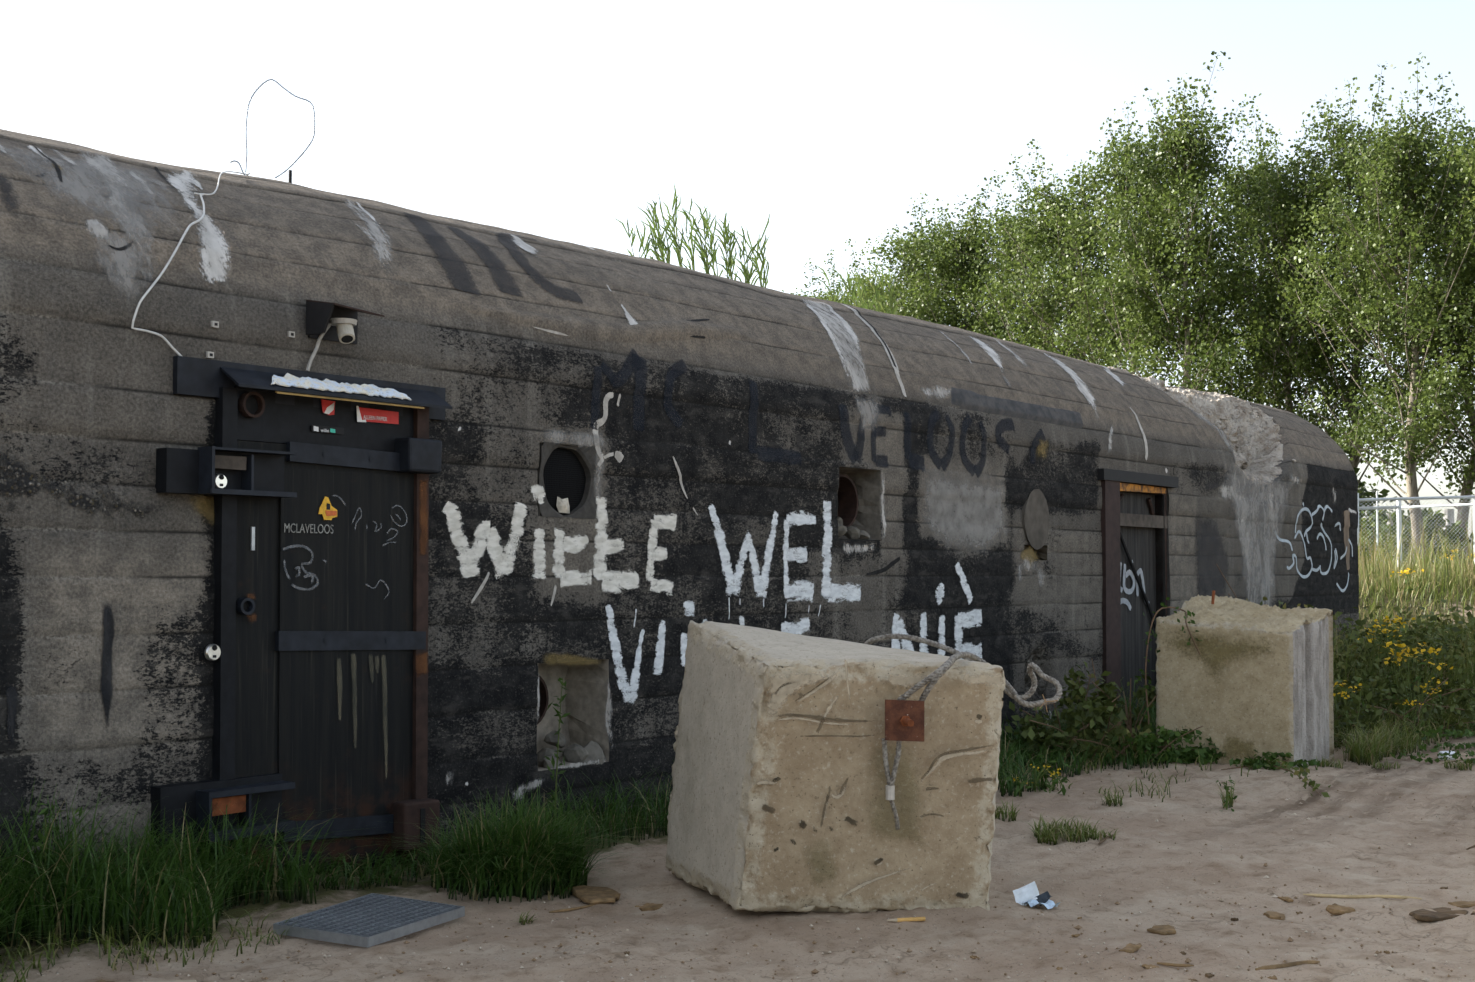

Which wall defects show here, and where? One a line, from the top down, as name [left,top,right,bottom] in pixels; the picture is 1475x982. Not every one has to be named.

leakage [0,145,231,288]
efflorescence [347,200,390,260]
spalling [1108,366,1296,494]
leakage [1196,470,1299,605]